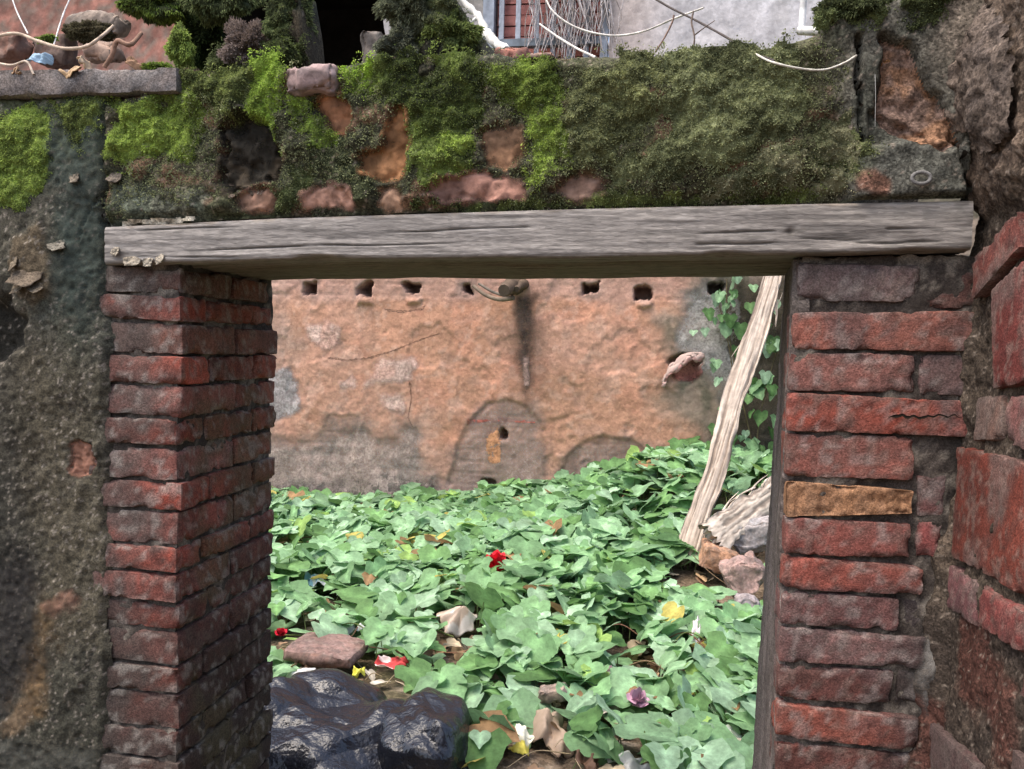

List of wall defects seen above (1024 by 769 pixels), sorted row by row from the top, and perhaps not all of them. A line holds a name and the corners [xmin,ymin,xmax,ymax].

crack [853,43,863,153]
spalling [874,40,957,151]
leakage [515,296,535,388]
spalling [69,440,97,477]
crack [890,412,962,420]